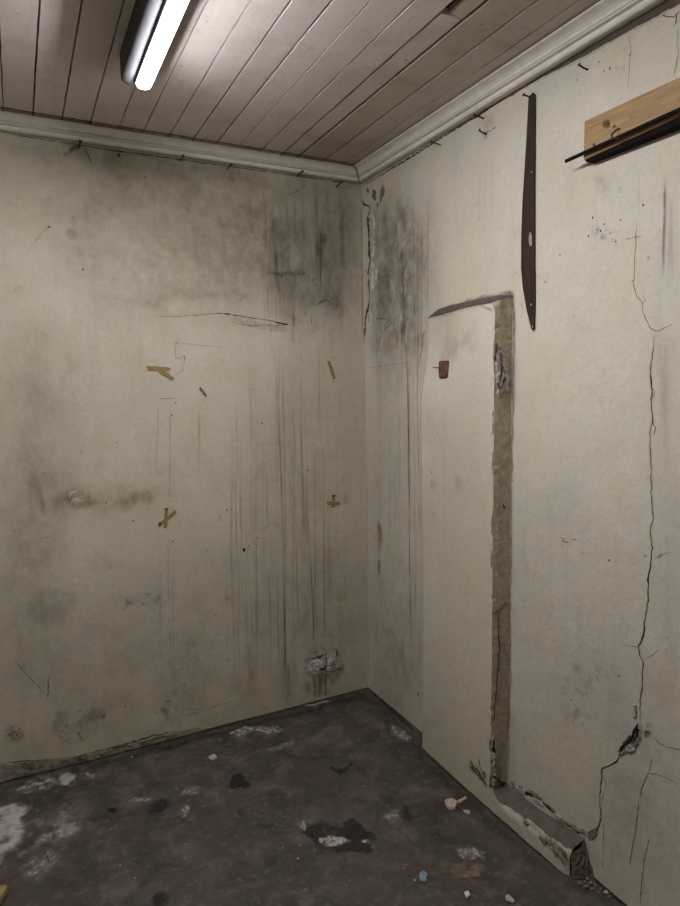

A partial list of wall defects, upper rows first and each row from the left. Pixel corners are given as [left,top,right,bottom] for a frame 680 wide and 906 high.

crack [0,104,496,337]
flaking render [494,341,511,396]
crack [622,222,671,715]
flaking render [617,704,649,756]
flaking render [470,733,504,786]
peeling [538,835,567,864]